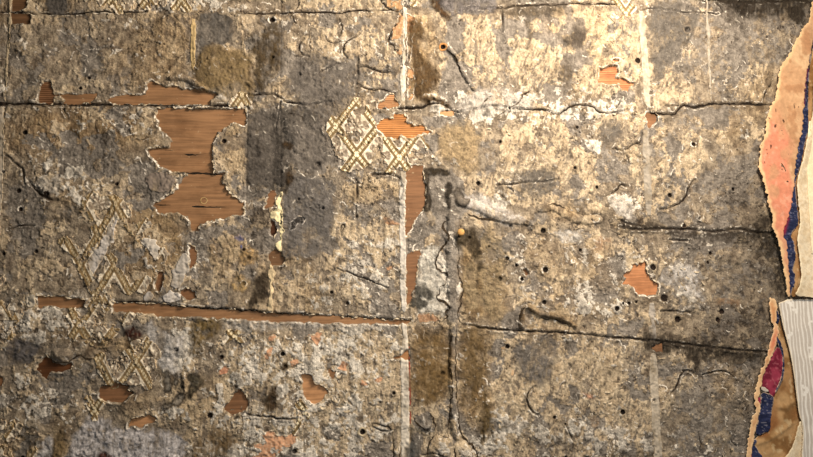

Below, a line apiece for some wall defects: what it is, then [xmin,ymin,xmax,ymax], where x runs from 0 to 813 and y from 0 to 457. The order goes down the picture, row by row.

peeling [38,81,98,105]
crack [0,94,326,125]
crack [649,85,771,116]
peeling [108,53,441,346]
flaking render [87,217,118,275]
crack [469,325,642,340]
crack [664,341,763,352]
crack [671,370,734,393]